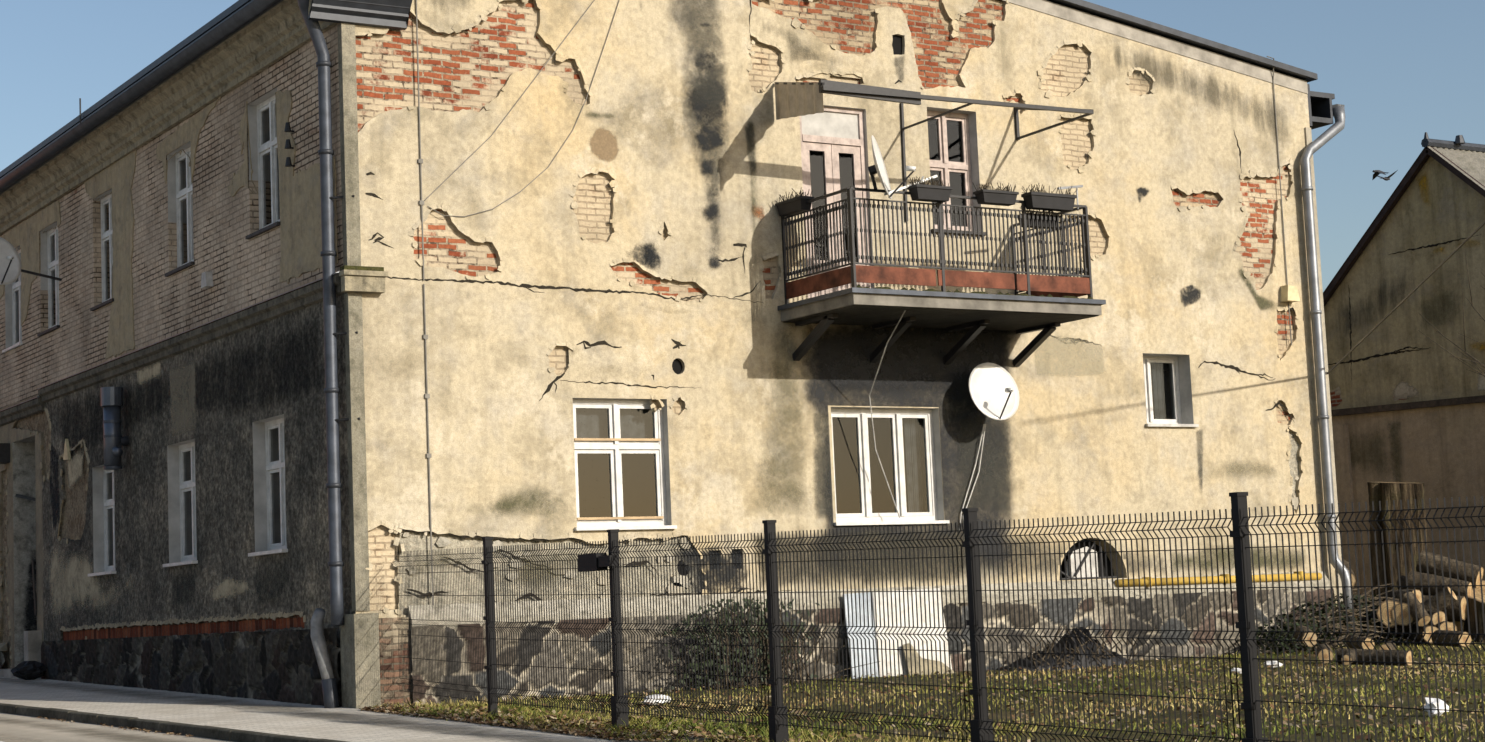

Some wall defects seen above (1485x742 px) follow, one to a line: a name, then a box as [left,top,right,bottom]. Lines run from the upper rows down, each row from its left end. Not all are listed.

flaking render [355,0,593,132]
flaking render [747,0,1010,93]
damp [590,129,619,161]
damp [689,54,726,173]
damp [747,123,755,168]
flaking render [408,203,504,280]
crack [365,172,763,303]
damp [705,204,718,220]
flaking render [1171,159,1294,290]
crack [539,339,700,401]
crack [1198,361,1295,423]
peeling [366,520,710,616]